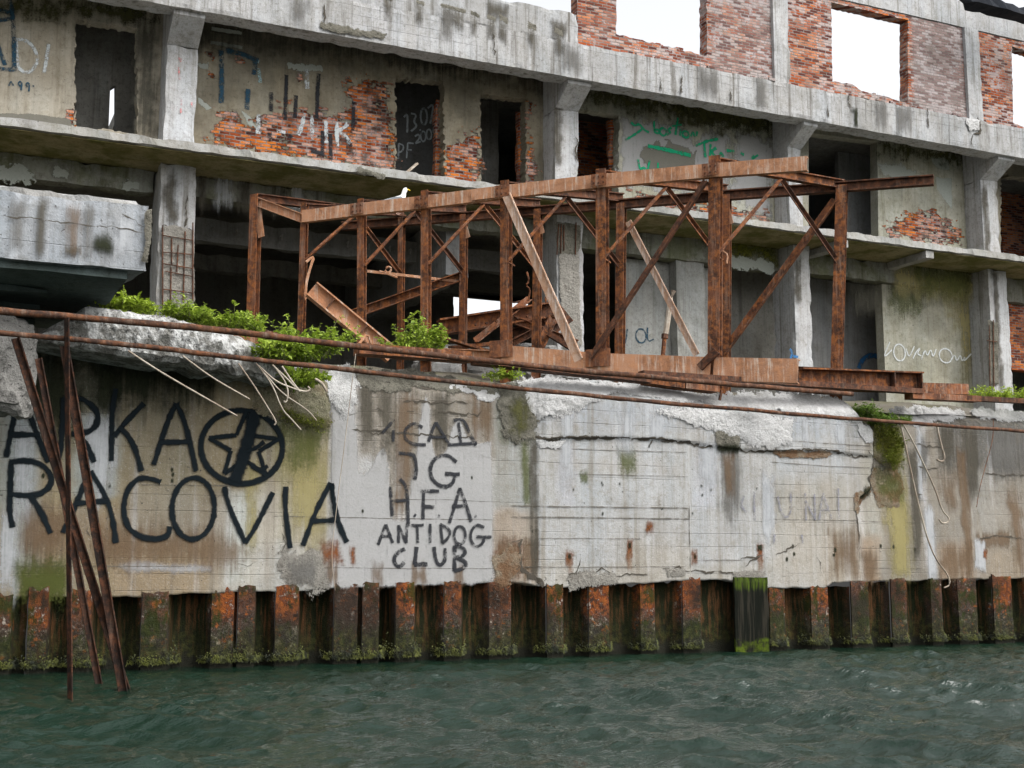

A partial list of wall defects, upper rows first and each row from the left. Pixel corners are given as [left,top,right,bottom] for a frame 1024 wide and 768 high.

water stain [36,201,46,255]
flaking render [198,73,402,180]
flaking render [441,126,487,182]
flaking render [877,157,965,245]
water stain [0,438,65,594]
corrosion [321,542,355,583]
water stain [496,442,539,576]
spalling [567,569,619,592]
spalling [182,355,1024,588]
crack [521,435,713,450]
crack [739,448,874,565]
water stain [887,423,1024,578]